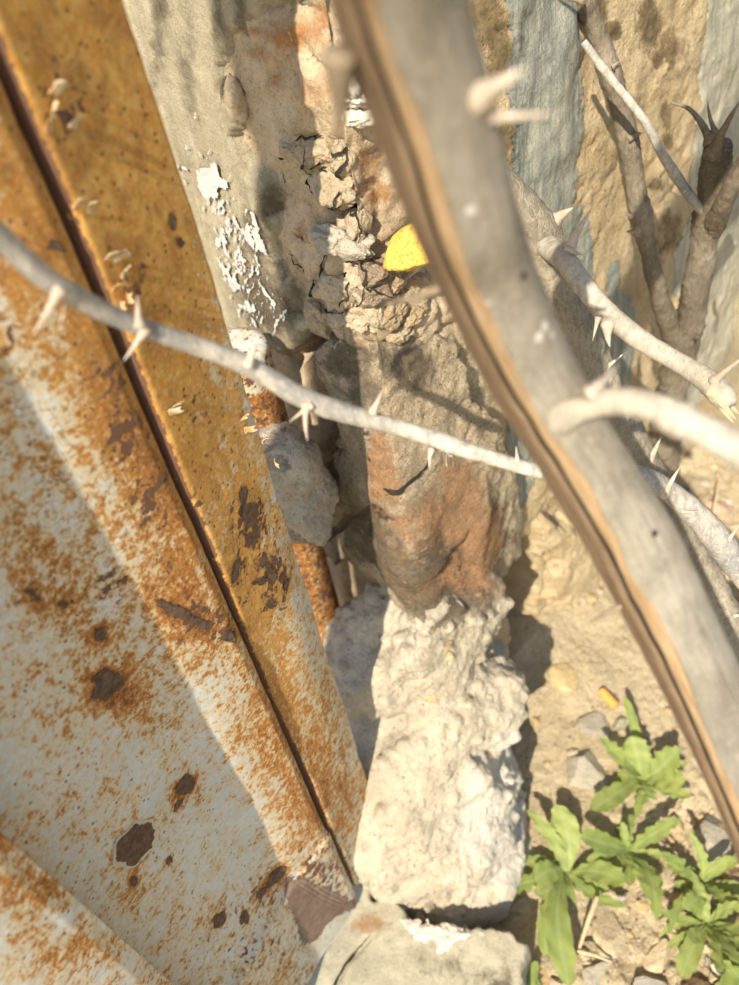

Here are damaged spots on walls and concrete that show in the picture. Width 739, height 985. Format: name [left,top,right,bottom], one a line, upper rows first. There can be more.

peeling [176,145,287,350]
crack [278,134,393,314]
crack [333,937,369,985]